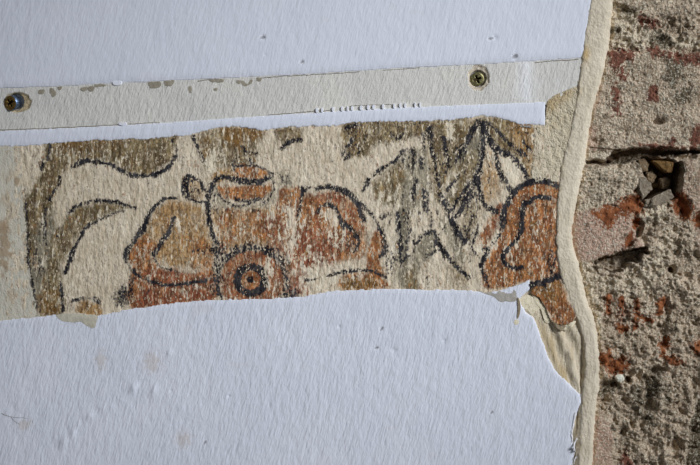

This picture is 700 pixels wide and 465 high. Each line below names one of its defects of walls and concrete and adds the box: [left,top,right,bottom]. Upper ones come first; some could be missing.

crack [586,146,700,165]
spalling [590,124,700,249]
crack [598,246,649,273]